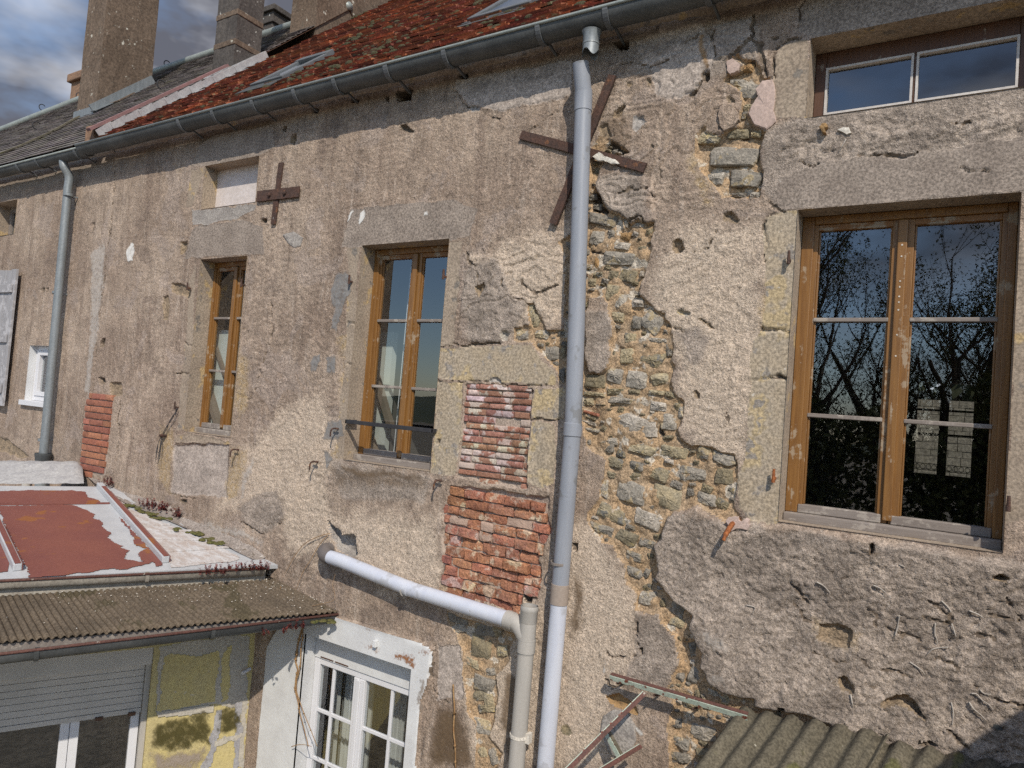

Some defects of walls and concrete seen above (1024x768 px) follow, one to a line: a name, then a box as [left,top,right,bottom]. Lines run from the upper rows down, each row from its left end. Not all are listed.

flaking render [695,53,776,224]
crack [466,251,559,305]
flaking render [500,235,571,386]
flaking render [582,104,829,768]
leakage [152,708,240,750]